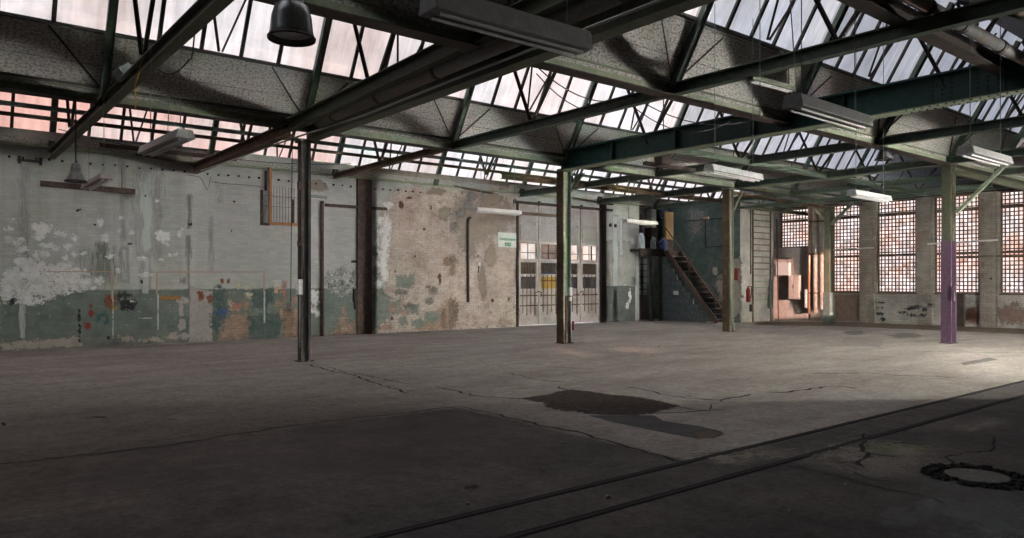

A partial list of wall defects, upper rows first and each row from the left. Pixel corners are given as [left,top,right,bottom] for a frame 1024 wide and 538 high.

peeling [0,215,135,306]
peeling [154,227,184,261]
peeling [372,184,519,334]
peeling [311,266,356,336]
crack [308,364,678,462]
crack [604,346,953,414]
crack [788,433,947,505]